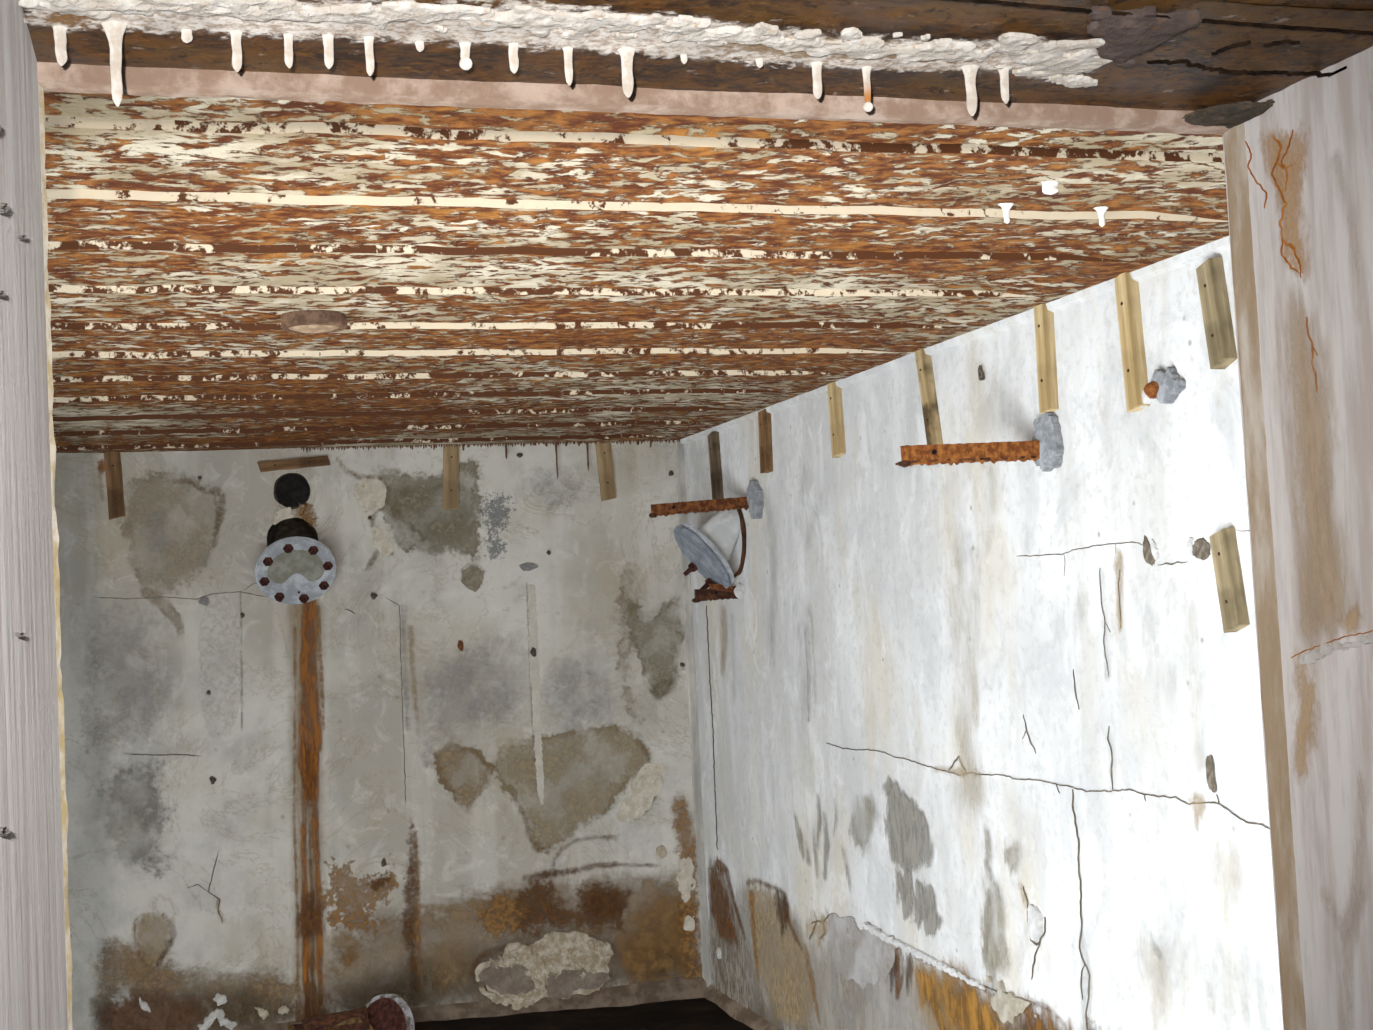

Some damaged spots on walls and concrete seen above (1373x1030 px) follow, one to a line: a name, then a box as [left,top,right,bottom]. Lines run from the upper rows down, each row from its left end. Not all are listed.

leakage [19,0,1113,88]
peeling [1087,6,1202,68]
corrosion [1245,130,1304,278]
crack [1021,542,1142,677]
corrosion [96,600,818,1030]
leakage [715,890,962,1030]
leakage [984,895,1006,977]
crack [828,714,1270,1030]